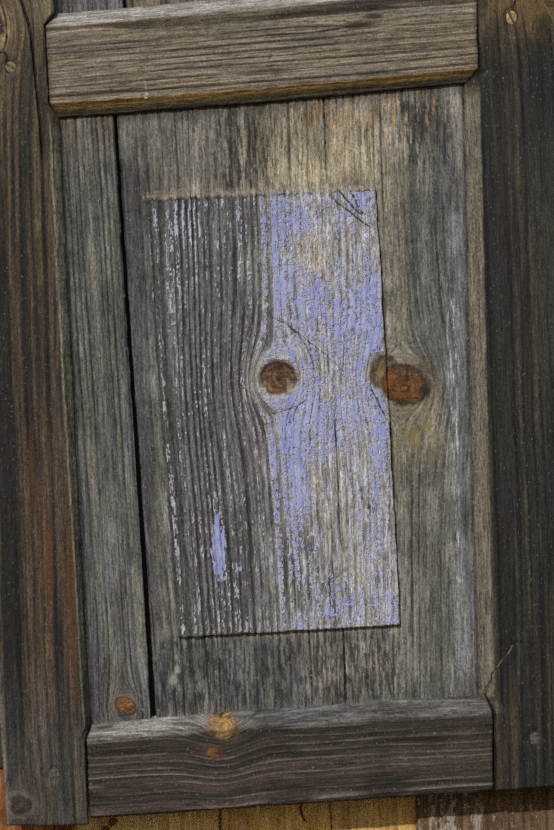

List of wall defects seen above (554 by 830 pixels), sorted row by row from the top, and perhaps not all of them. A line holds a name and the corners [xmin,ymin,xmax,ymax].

crack [323,98,370,227]
peeling [149,191,399,635]
crack [333,421,341,524]
crack [341,630,349,702]
crack [483,641,518,716]